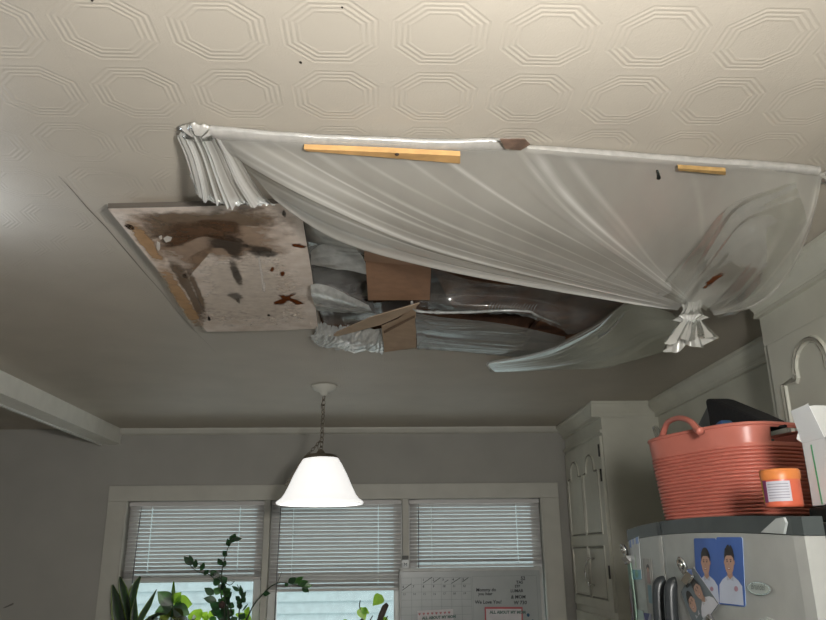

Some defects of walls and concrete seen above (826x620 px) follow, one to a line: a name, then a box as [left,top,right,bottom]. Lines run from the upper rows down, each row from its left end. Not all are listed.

damp [131,209,293,323]